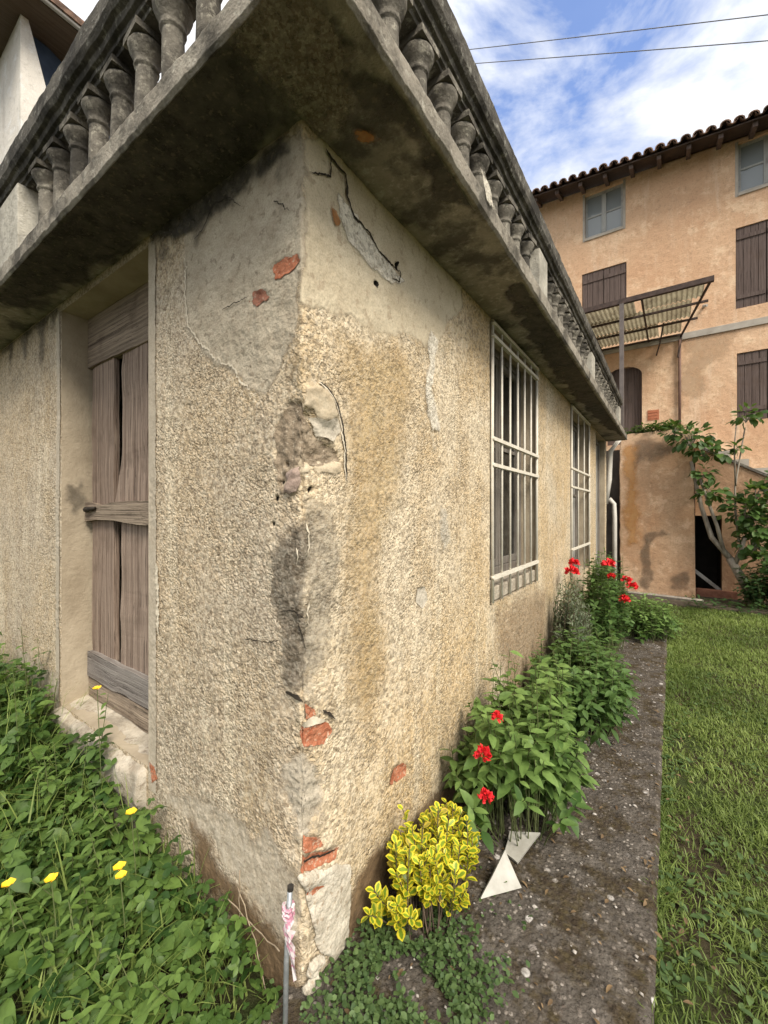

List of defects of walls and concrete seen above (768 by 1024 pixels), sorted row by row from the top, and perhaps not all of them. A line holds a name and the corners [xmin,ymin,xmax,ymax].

leakage [0,0,473,310]
peeling [183,131,463,393]
crack [312,149,404,283]
spalling [273,384,341,501]
leakage [270,522,315,691]
leakage [641,532,664,588]
spalling [281,704,351,996]
flaking render [390,763,406,785]